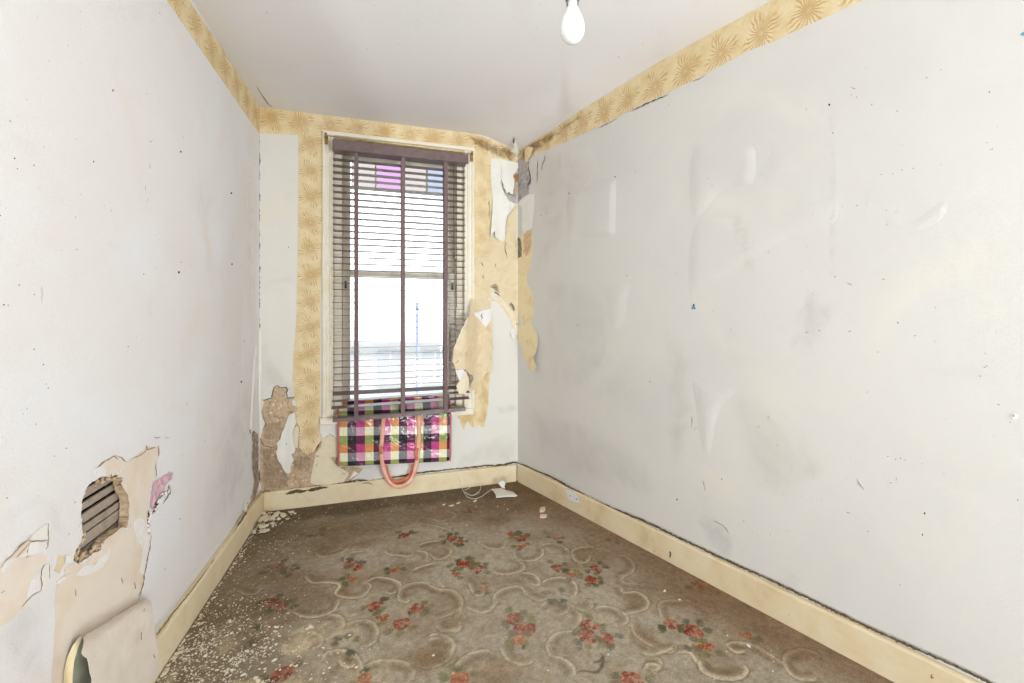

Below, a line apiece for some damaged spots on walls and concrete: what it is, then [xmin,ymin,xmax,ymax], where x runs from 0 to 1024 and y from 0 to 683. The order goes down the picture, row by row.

flaking render [474,204,538,371]
flaking render [243,385,367,512]
flaking render [0,445,160,683]